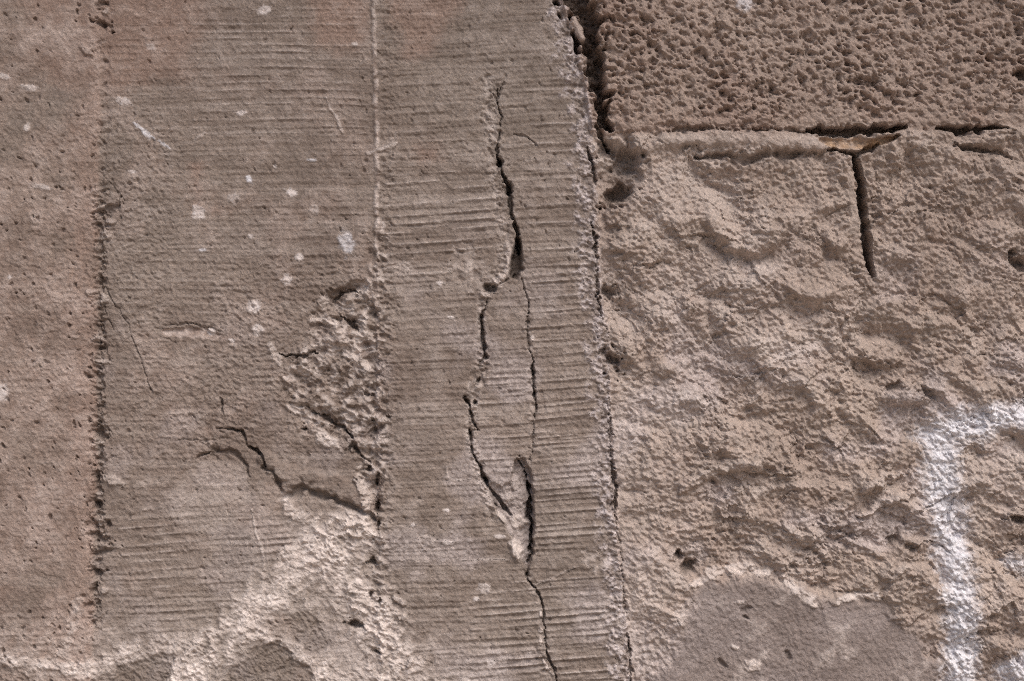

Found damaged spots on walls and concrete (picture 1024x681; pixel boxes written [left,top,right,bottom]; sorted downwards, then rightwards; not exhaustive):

crack [490,83,521,246]
crack [848,152,875,278]
crack [935,123,1012,160]
crack [203,397,377,522]
spalling [280,280,391,545]
crack [463,395,496,506]
crack [478,303,488,367]
crack [504,278,537,462]
crack [524,565,557,681]